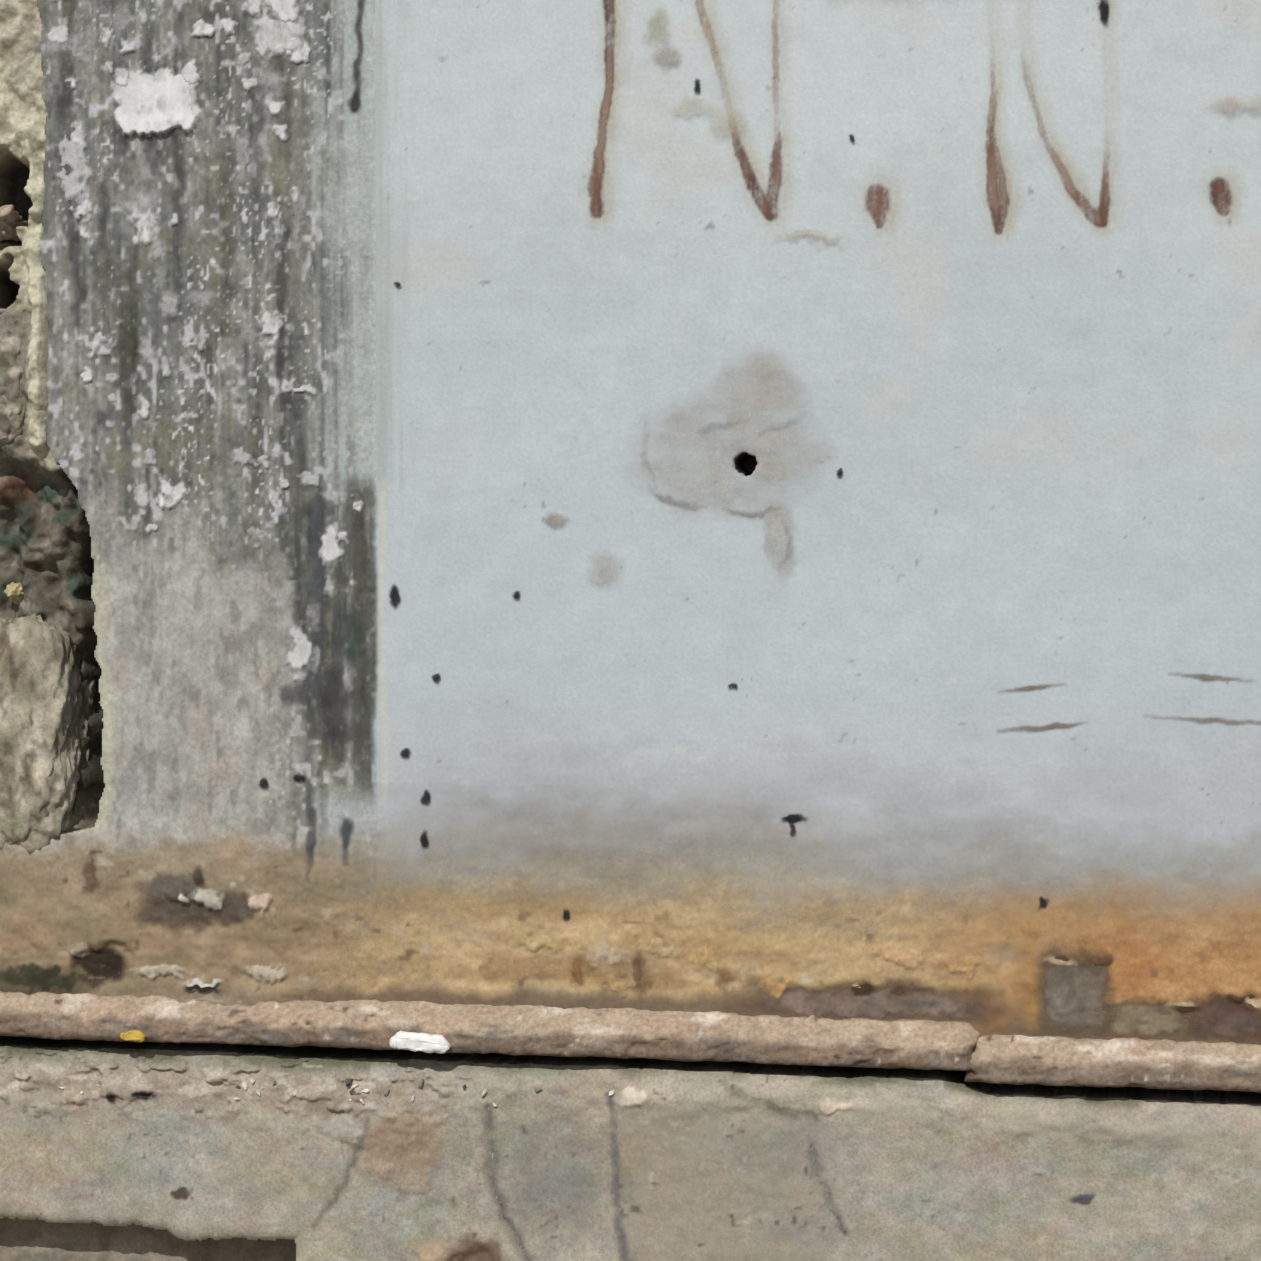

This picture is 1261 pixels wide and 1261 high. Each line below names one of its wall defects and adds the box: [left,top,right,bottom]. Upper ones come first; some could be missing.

peeling [192,18,233,36]
peeling [239,0,310,63]
peeling [102,21,201,135]
peeling [242,74,286,140]
peeling [55,121,92,239]
peeling [135,480,186,508]
peeling [319,526,347,594]
peeling [287,627,319,681]
damp [281,490,374,764]
damp [307,808,315,861]
damp [341,819,352,849]
crack [491,1172,531,1261]